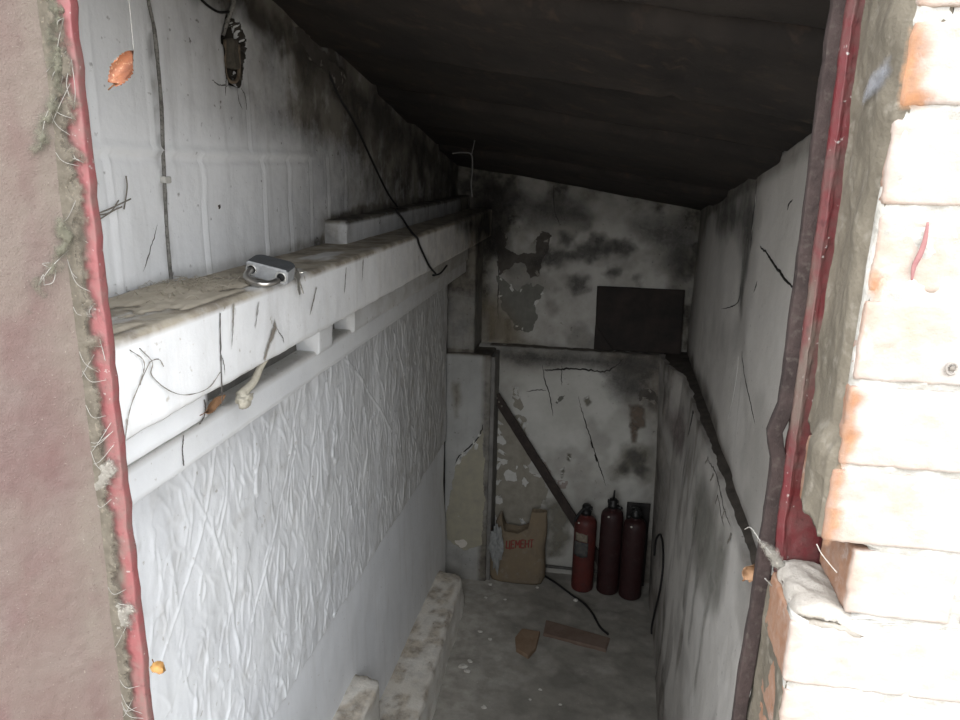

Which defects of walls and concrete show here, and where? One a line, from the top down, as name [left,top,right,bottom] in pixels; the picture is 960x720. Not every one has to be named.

peeling [496,231,552,332]
damp [541,234,634,266]
crack [723,246,793,309]
spalling [446,387,571,550]
crack [528,358,624,485]